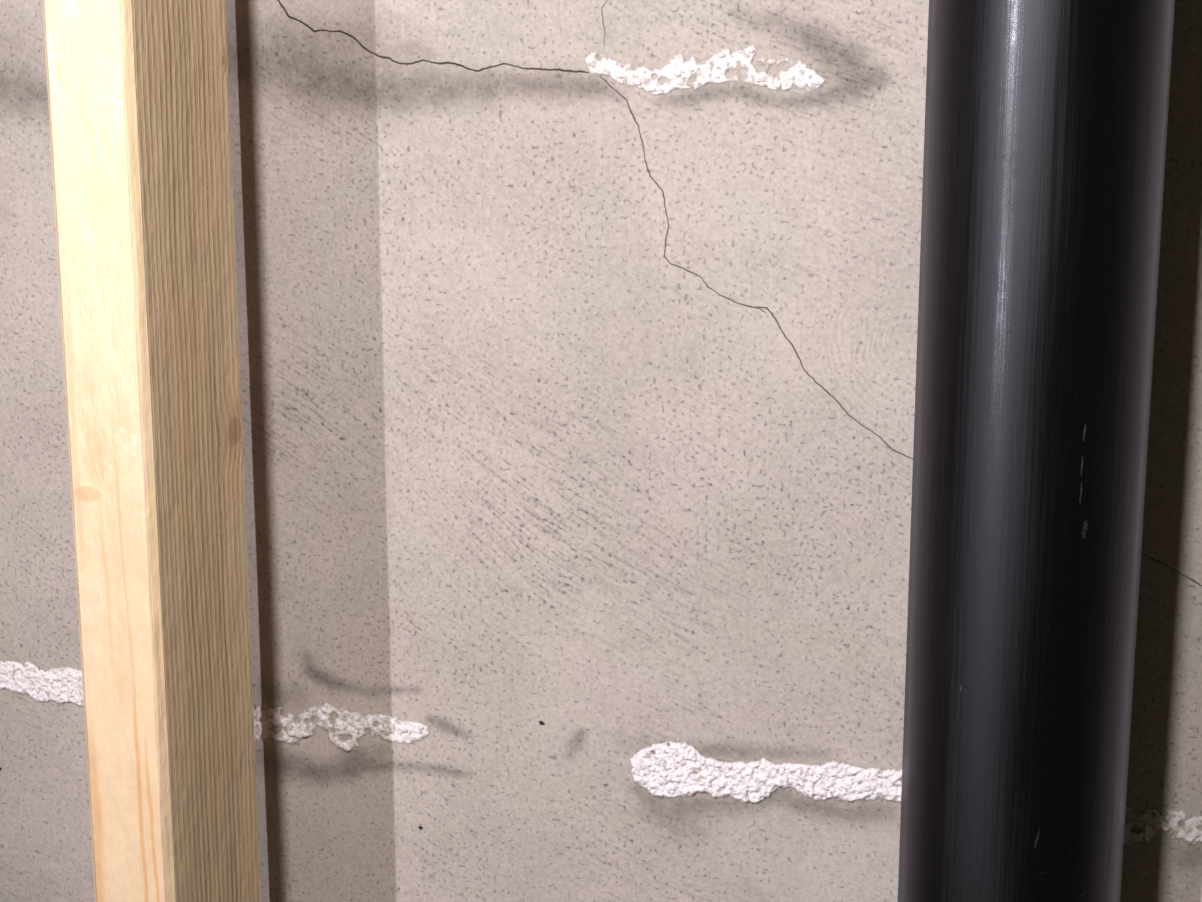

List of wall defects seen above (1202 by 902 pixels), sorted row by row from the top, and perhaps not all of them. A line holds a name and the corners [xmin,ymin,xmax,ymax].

crack [278,0,589,73]
water stain [584,45,825,95]
crack [620,94,913,459]
crack [1141,553,1202,586]
water stain [0,660,84,707]
water stain [253,703,430,752]
water stain [630,740,902,803]
water stain [1124,805,1202,846]